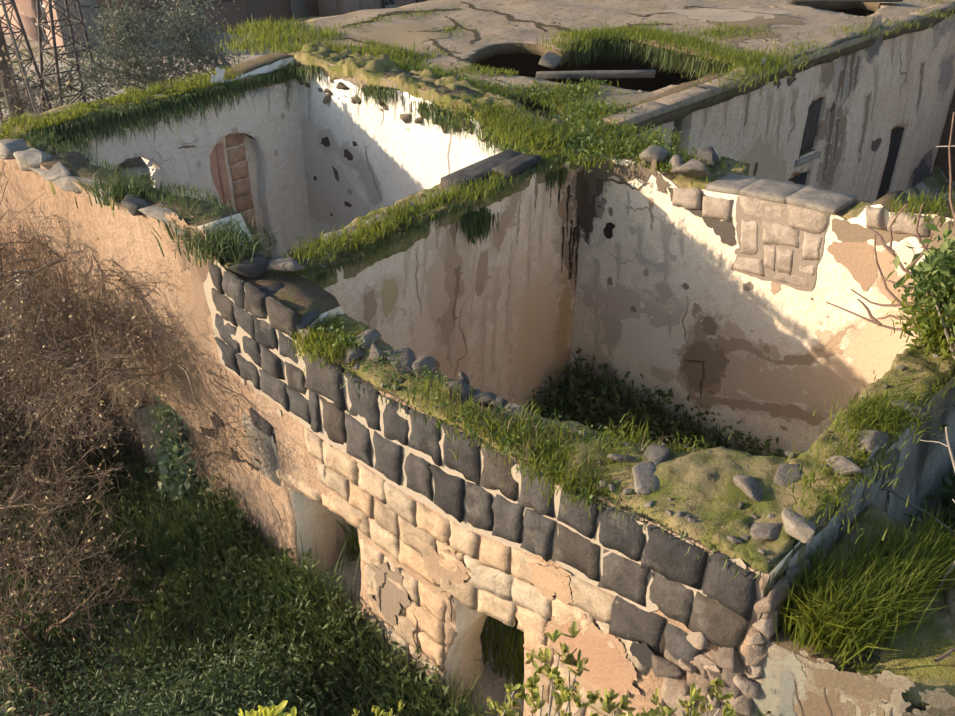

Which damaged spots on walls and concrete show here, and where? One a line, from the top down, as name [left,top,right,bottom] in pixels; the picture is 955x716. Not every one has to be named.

crack [322,1,592,60]
crack [615,6,806,29]
leakage [932,14,955,101]
leakage [737,82,799,183]
leakage [810,32,925,190]
spalling [603,207,615,239]
spalling [584,157,673,204]
flaking render [684,193,954,294]
leakage [354,151,928,436]
peeling [621,301,730,395]
crack [682,298,705,398]
peeling [751,652,809,716]